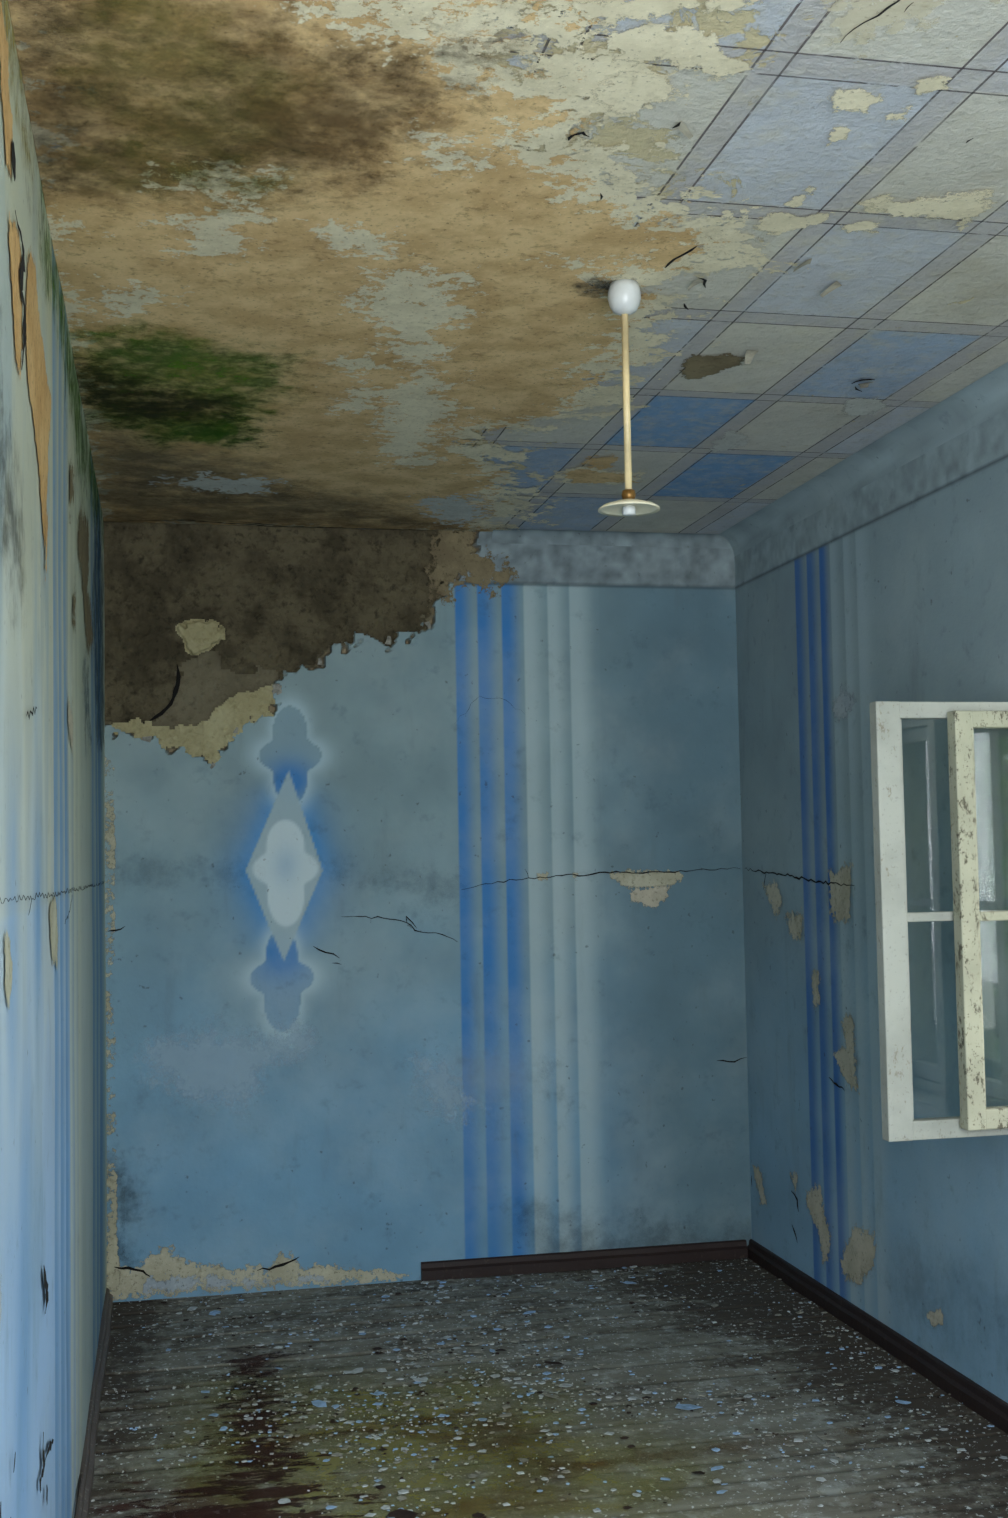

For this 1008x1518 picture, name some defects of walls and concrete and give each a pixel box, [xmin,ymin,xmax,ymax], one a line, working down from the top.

leakage [1,0,81,112]
crack [840,0,911,43]
peeling [0,0,999,769]
leakage [45,232,420,749]
peeling [609,869,684,909]
crack [462,867,854,890]
spalling [105,757,409,1302]
peeling [790,1171,877,1287]